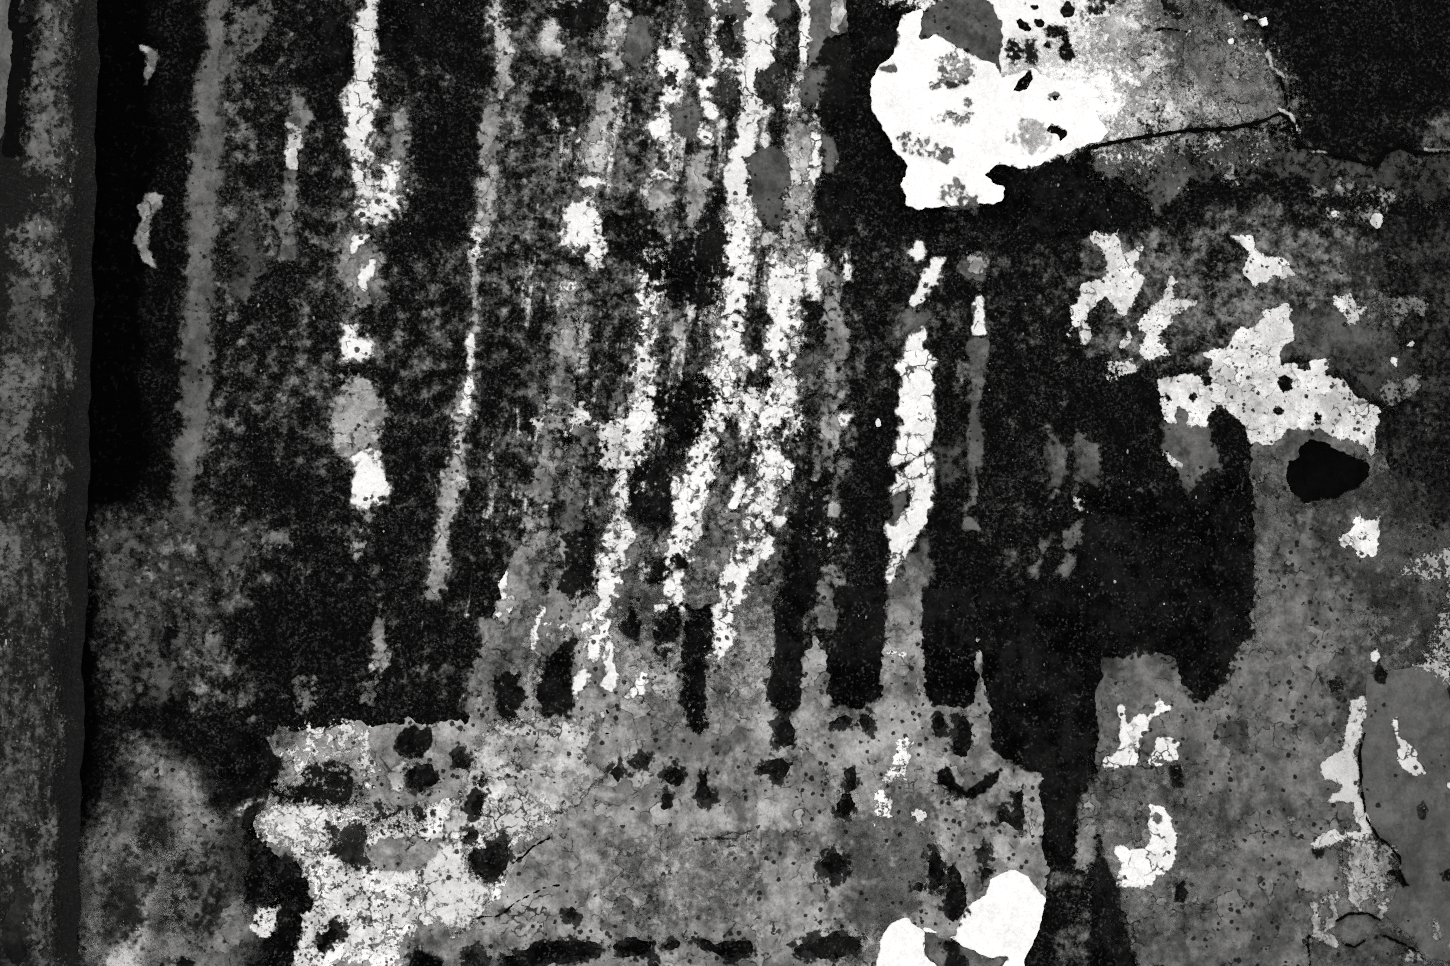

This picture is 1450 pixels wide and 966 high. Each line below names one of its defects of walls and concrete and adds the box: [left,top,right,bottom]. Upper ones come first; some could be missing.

leakage [374,0,432,56]
crack [1088,0,1450,169]
leakage [349,158,414,232]
peeling [743,141,795,257]
leakage [420,0,598,603]
leakage [556,144,810,528]
peeling [724,380,765,422]
peeling [836,410,855,435]
peeling [870,0,1450,966]
leakage [493,529,603,722]
peeling [240,457,1050,966]
leakage [618,602,718,735]